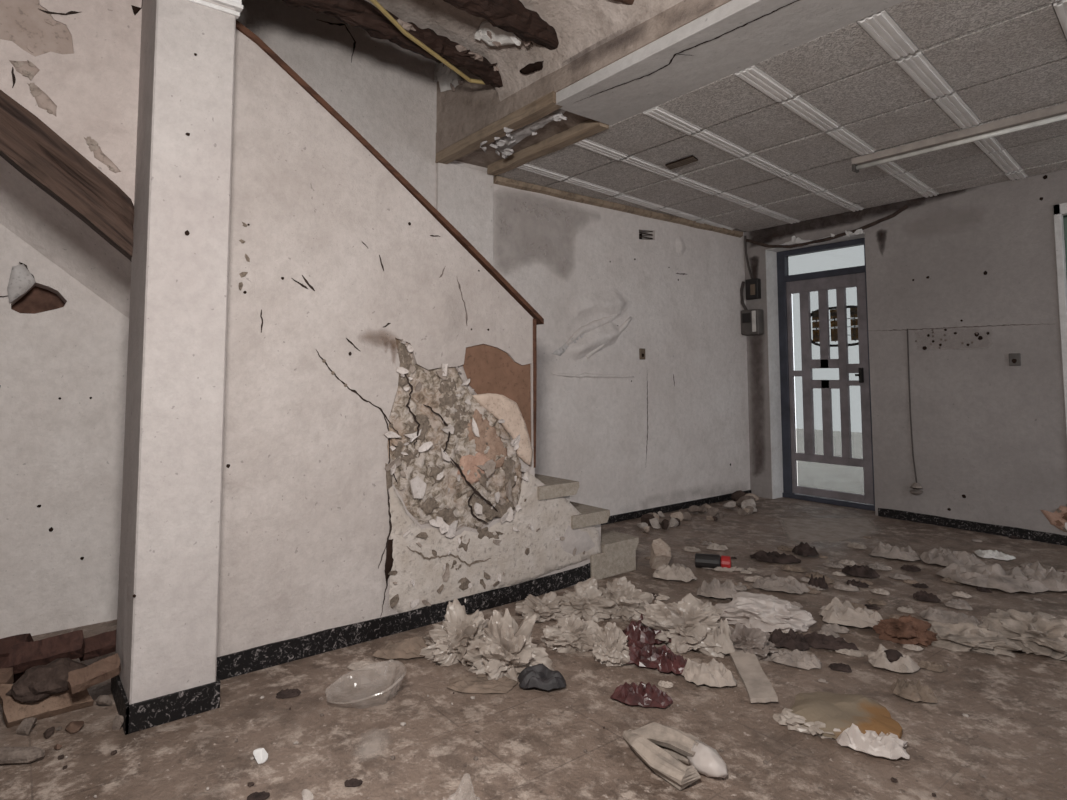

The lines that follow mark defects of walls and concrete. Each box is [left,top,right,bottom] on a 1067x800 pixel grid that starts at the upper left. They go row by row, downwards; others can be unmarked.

spalling [0,0,74,116]
spalling [475,20,531,47]
spalling [0,262,65,314]
crack [316,350,402,617]
spalling [384,339,602,613]